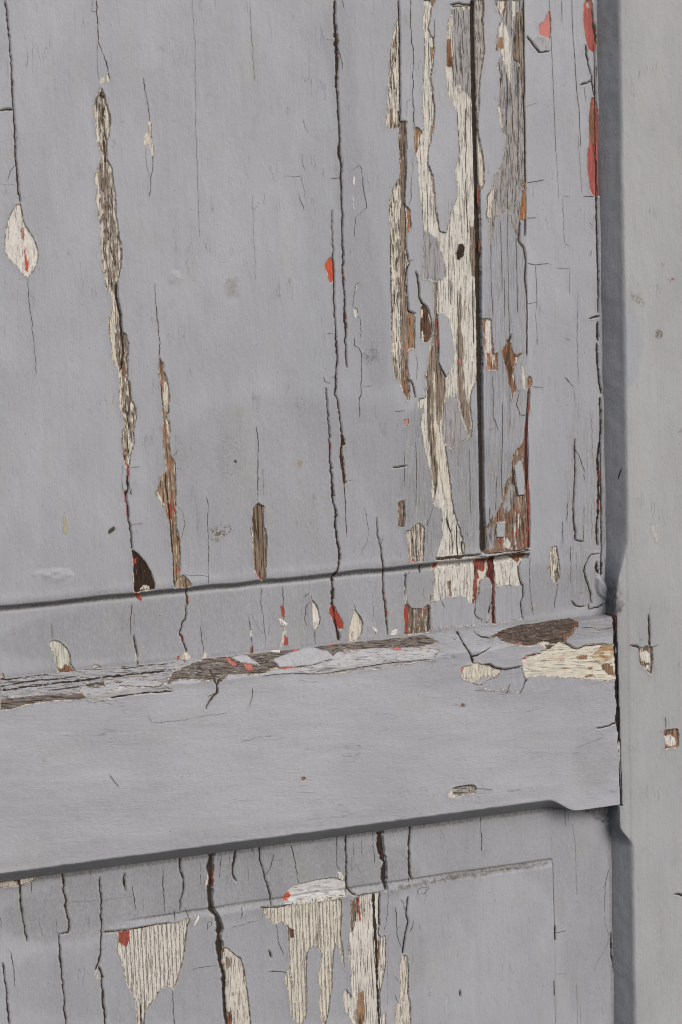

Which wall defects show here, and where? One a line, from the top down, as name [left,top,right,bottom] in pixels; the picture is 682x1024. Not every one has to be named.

crack [0,3,20,201]
peeling [0,0,617,709]
crack [323,0,621,793]
peeling [631,615,657,673]
peeling [664,718,678,749]
crack [0,846,299,1024]
peeling [104,915,199,1024]
peeling [221,946,250,1024]
peeling [262,872,414,1024]